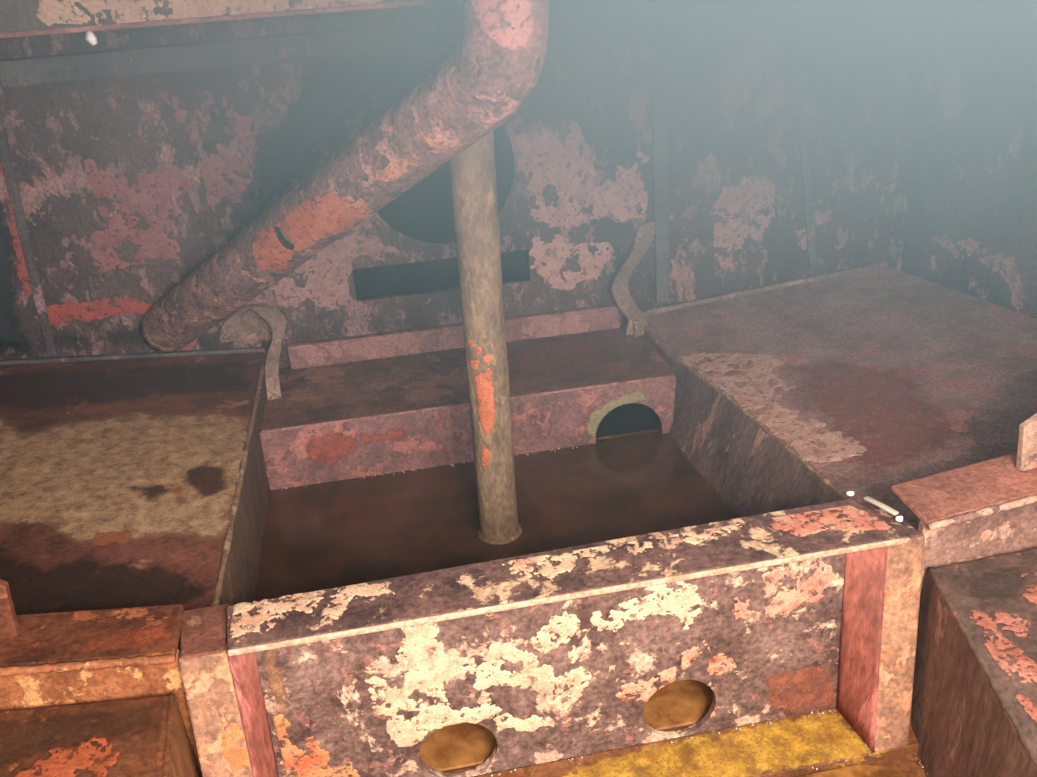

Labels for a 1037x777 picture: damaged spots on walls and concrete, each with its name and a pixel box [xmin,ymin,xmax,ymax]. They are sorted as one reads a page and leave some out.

peeling [36,0,405,46]
peeling [515,121,650,290]
water stain [0,364,245,408]
water stain [0,549,203,615]
rust [266,649,287,730]
peeling [365,581,704,747]
peeling [615,640,733,702]
rust [563,666,870,777]